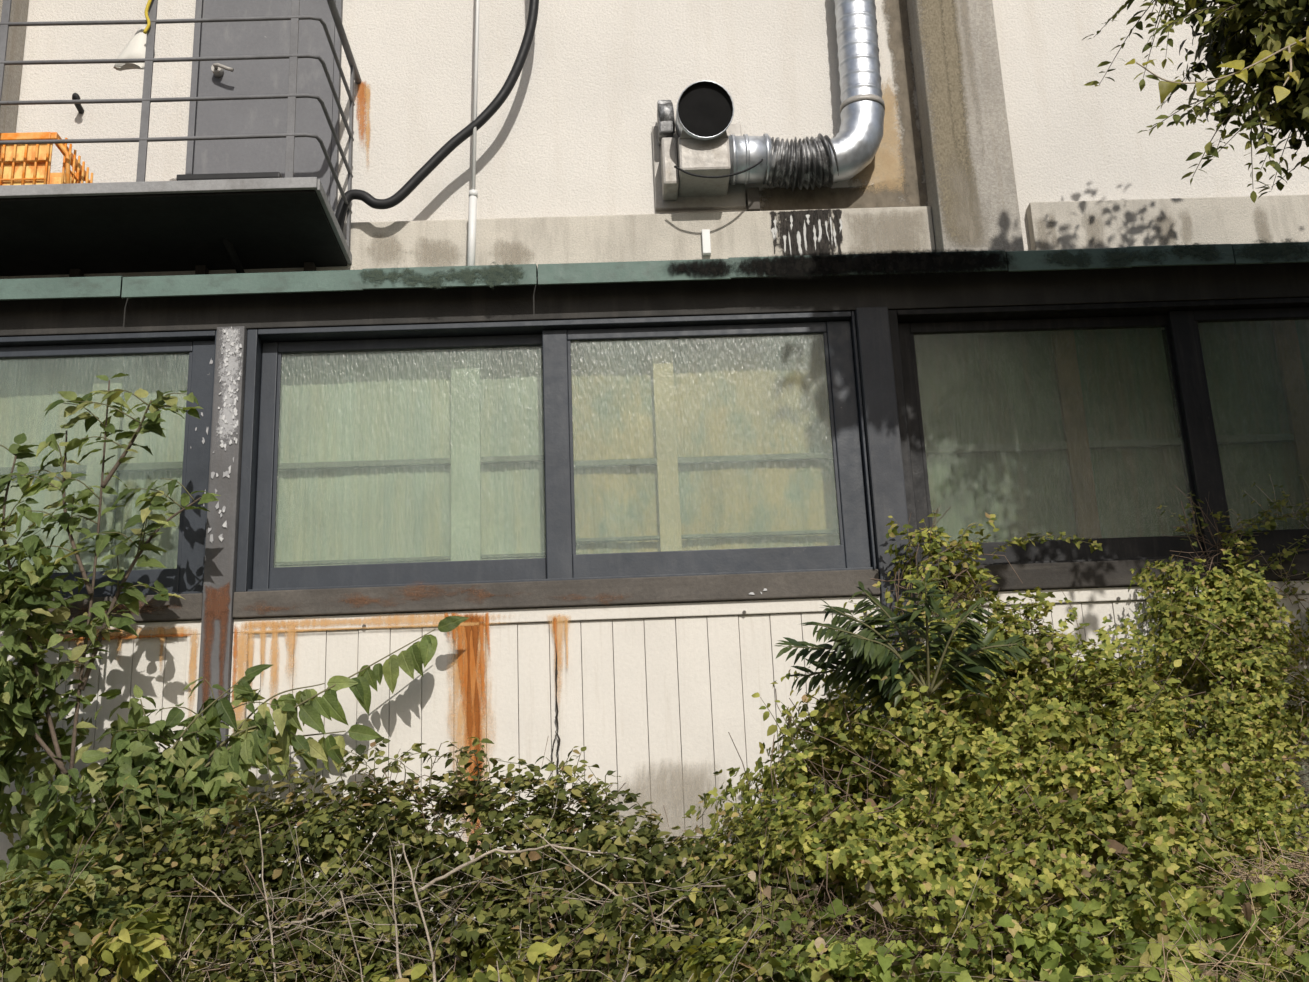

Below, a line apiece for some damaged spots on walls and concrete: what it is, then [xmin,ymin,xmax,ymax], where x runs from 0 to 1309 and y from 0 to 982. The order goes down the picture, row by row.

corrosion [357,82,370,147]
damp [668,0,1009,279]
peeling [189,327,242,543]
corrosion [30,583,490,834]
corrosion [552,615,568,678]